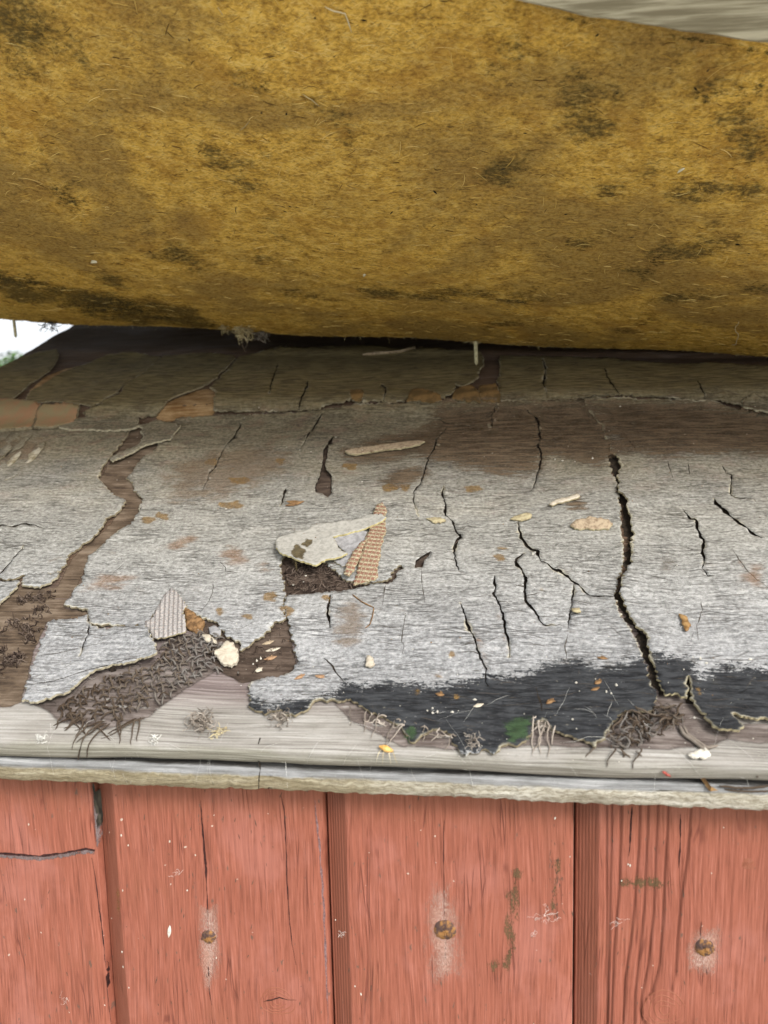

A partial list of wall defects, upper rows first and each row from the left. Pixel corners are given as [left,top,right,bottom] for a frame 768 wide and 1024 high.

peeling [741,392,768,413]
peeling [315,439,333,497]
peeling [0,389,296,730]
peeling [276,514,386,598]
crack [29,363,768,727]
peeling [335,701,458,750]
peeling [502,695,768,750]
crack [0,848,111,1021]
leakage [487,868,522,972]